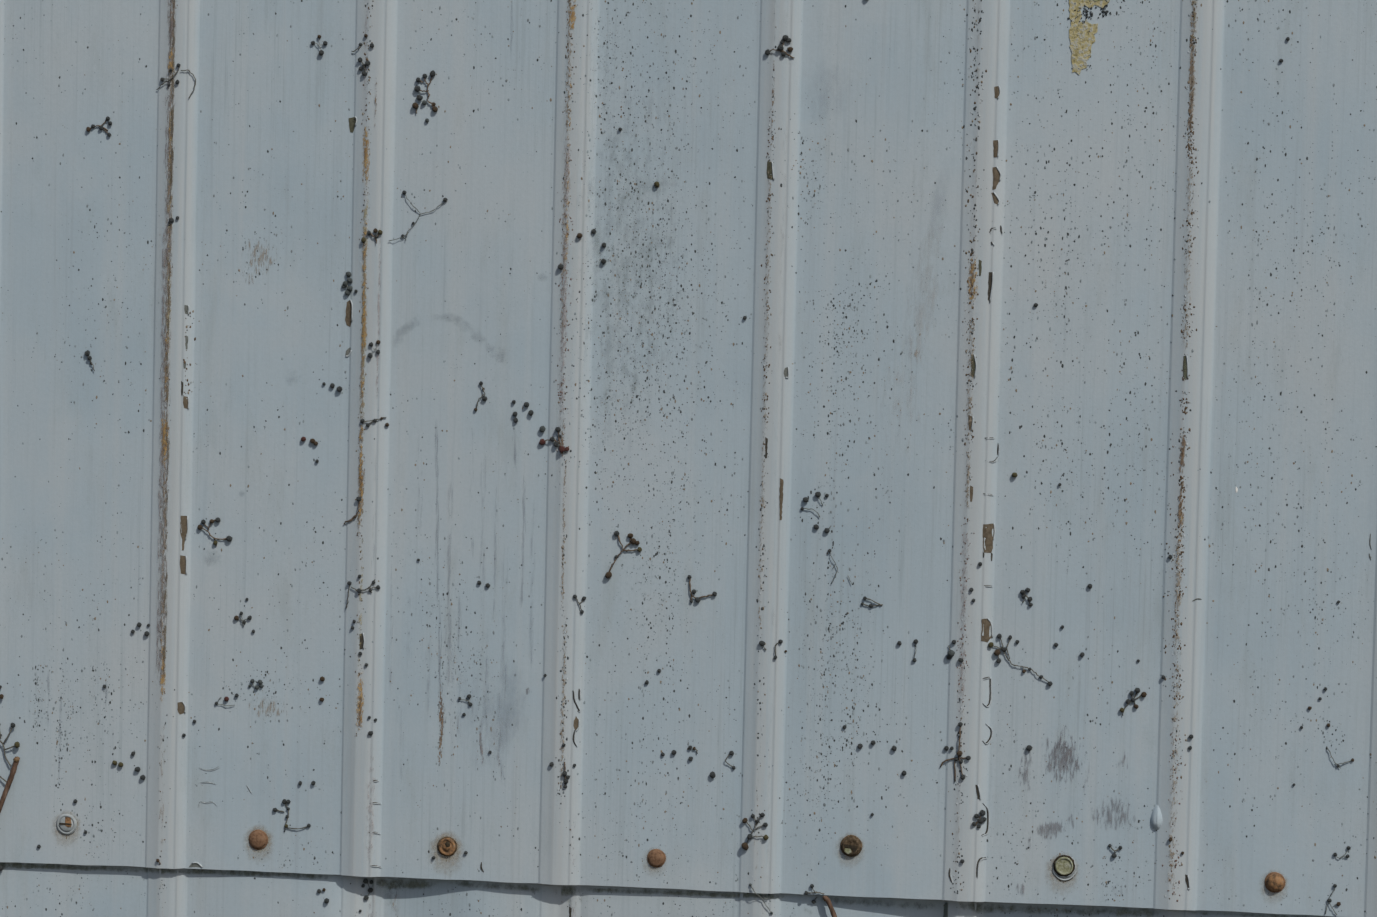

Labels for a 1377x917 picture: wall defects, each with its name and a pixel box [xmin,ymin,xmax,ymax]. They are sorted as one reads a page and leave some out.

rust [157,0,196,857]
rust [355,1,377,737]